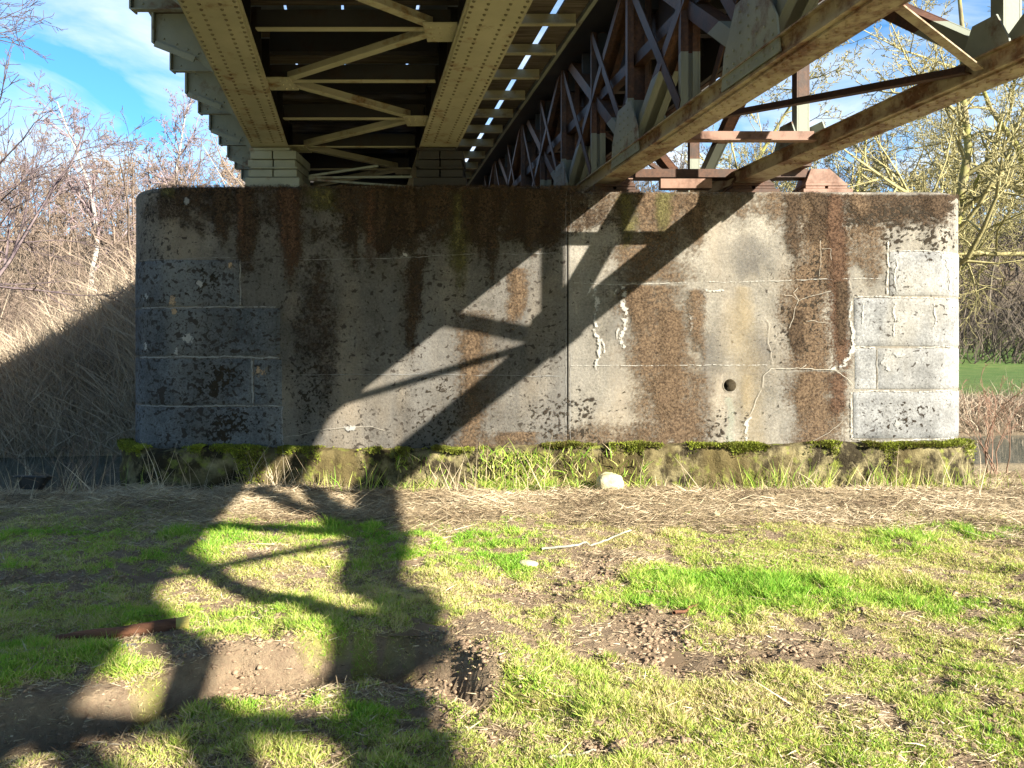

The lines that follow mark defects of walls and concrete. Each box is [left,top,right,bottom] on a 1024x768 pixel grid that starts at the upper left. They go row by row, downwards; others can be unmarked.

damp [143,184,959,448]
crack [750,240,854,415]
corrosion [828,217,854,370]